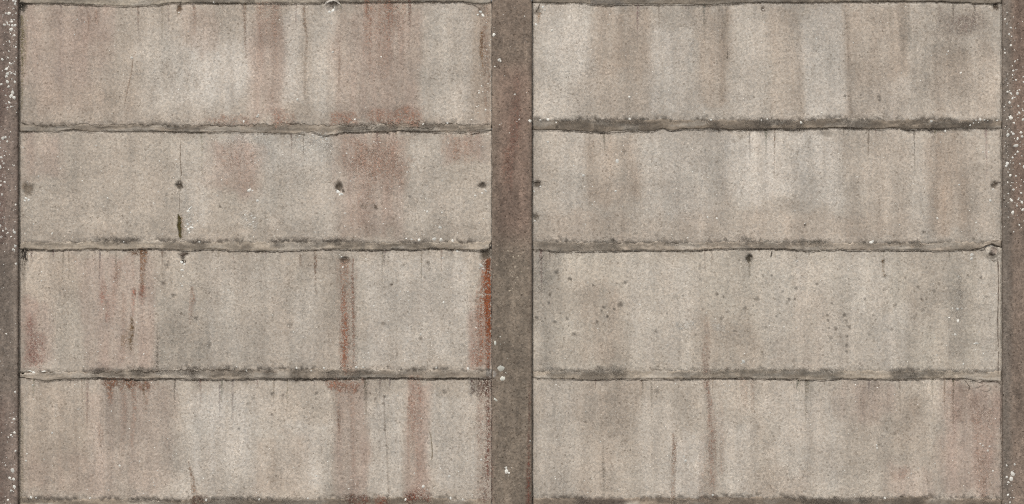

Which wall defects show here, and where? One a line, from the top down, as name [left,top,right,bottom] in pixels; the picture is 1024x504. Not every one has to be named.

crack [31,0,492,253]
rust [470,258,491,367]